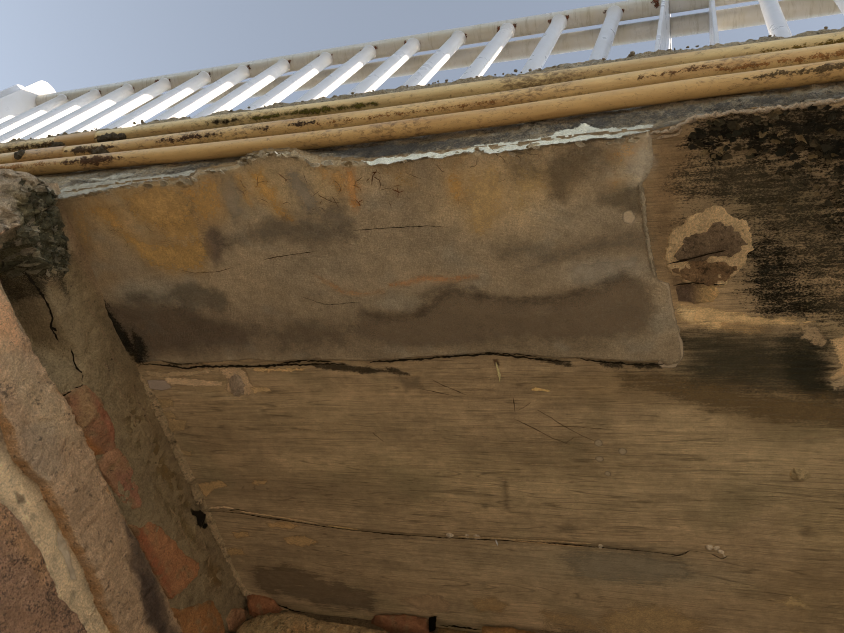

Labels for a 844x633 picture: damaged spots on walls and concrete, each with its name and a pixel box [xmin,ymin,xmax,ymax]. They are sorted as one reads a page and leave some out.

water stain [314,128,534,158]
peeling [237,97,844,182]
peeling [0,177,71,277]
crack [24,271,83,396]
water stain [104,285,247,367]
crack [143,352,664,376]
water stain [361,258,649,346]
water stain [546,91,844,428]
crack [208,509,727,559]